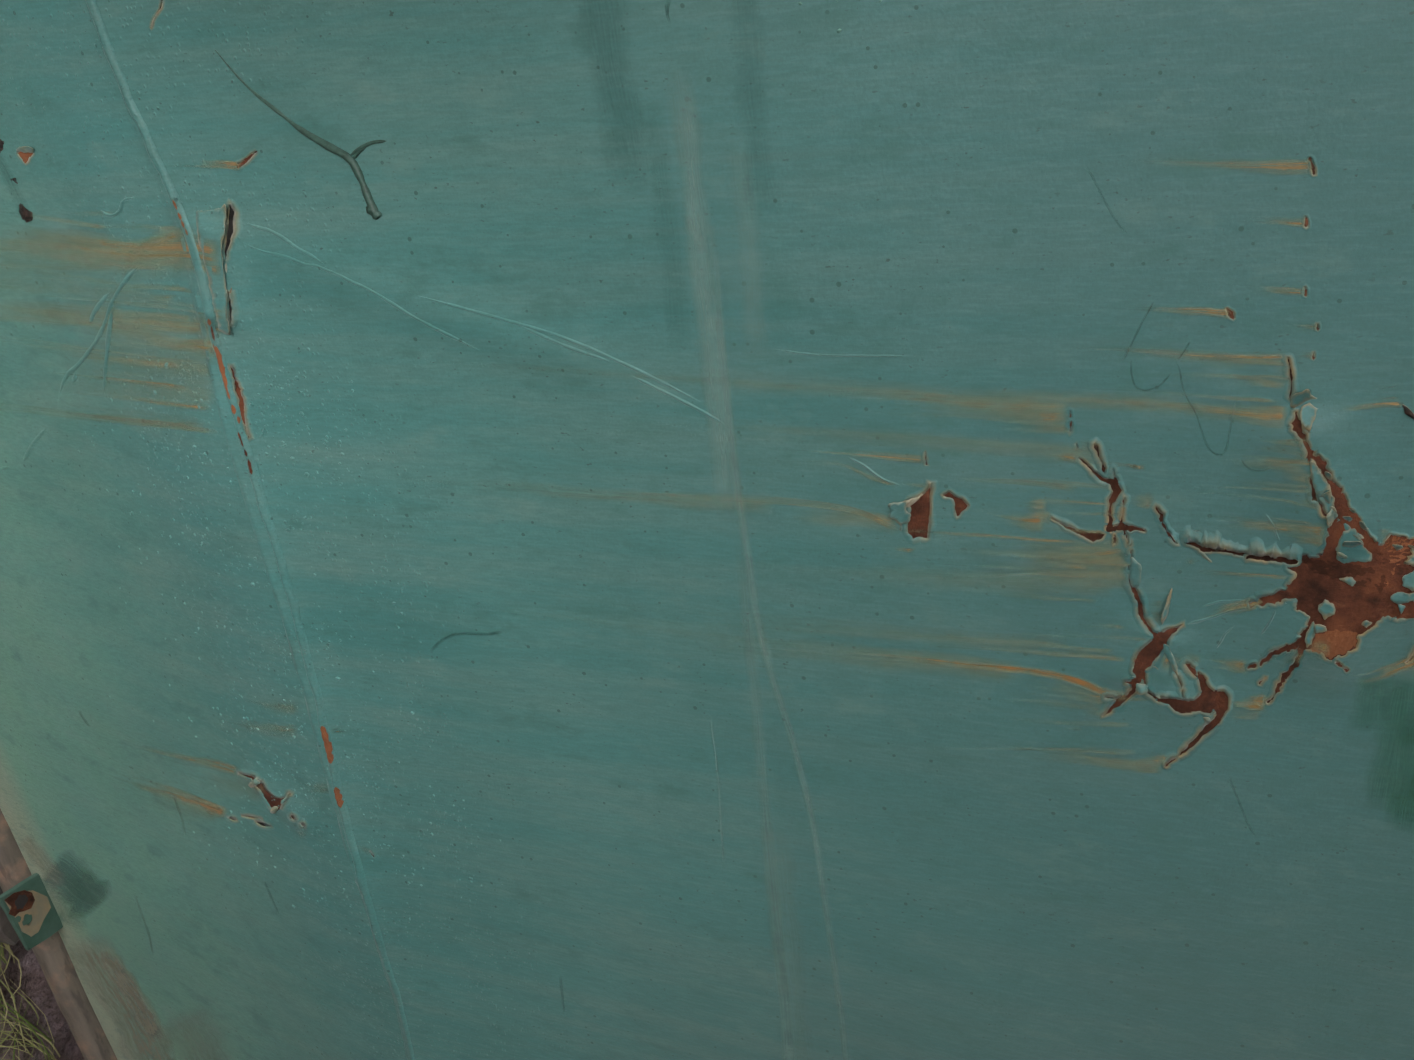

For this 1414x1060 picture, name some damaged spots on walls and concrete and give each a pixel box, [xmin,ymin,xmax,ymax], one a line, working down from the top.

corrosion [19,203,33,223]
corrosion [83,197,217,272]
corrosion [108,318,256,474]
peeling [849,449,972,551]
corrosion [320,726,339,764]
peeling [161,758,309,830]
corrosion [334,787,344,808]